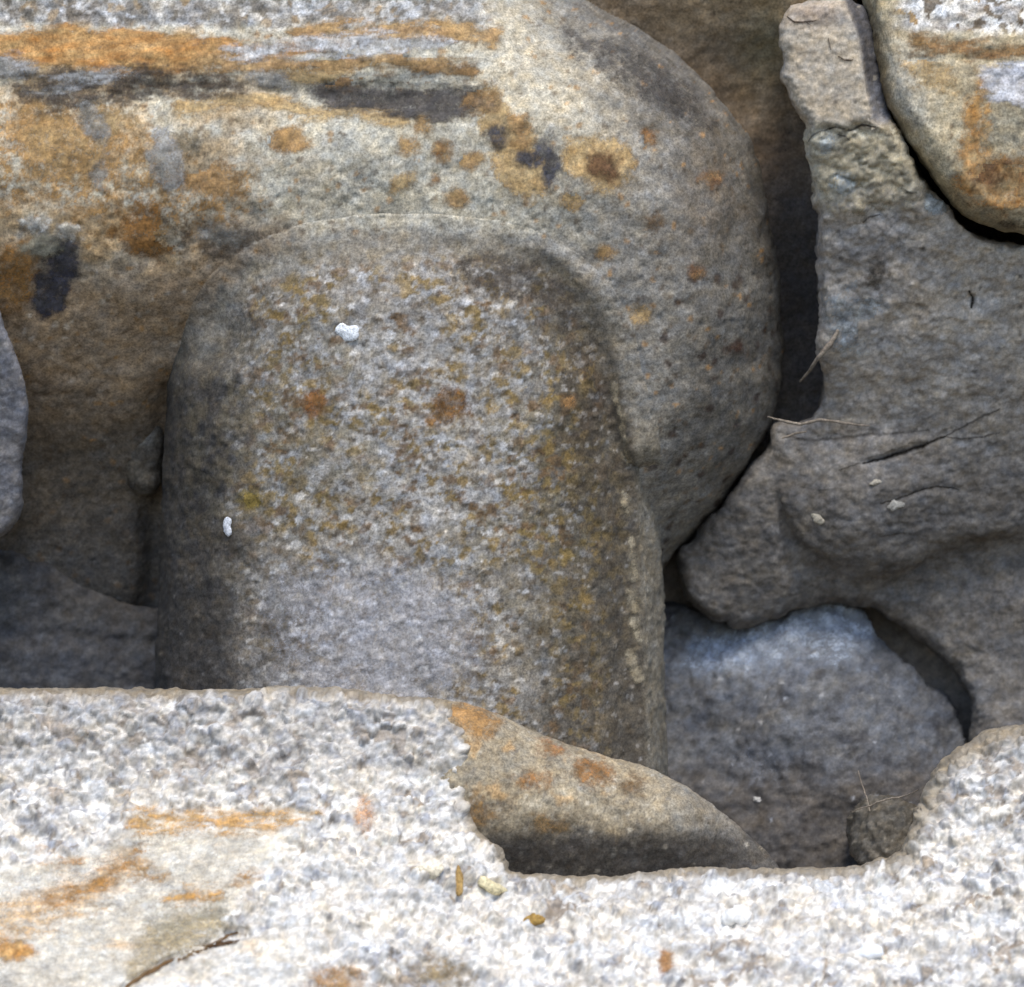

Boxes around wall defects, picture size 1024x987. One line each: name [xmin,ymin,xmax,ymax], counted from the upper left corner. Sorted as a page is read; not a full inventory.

crack [787,409,999,470]